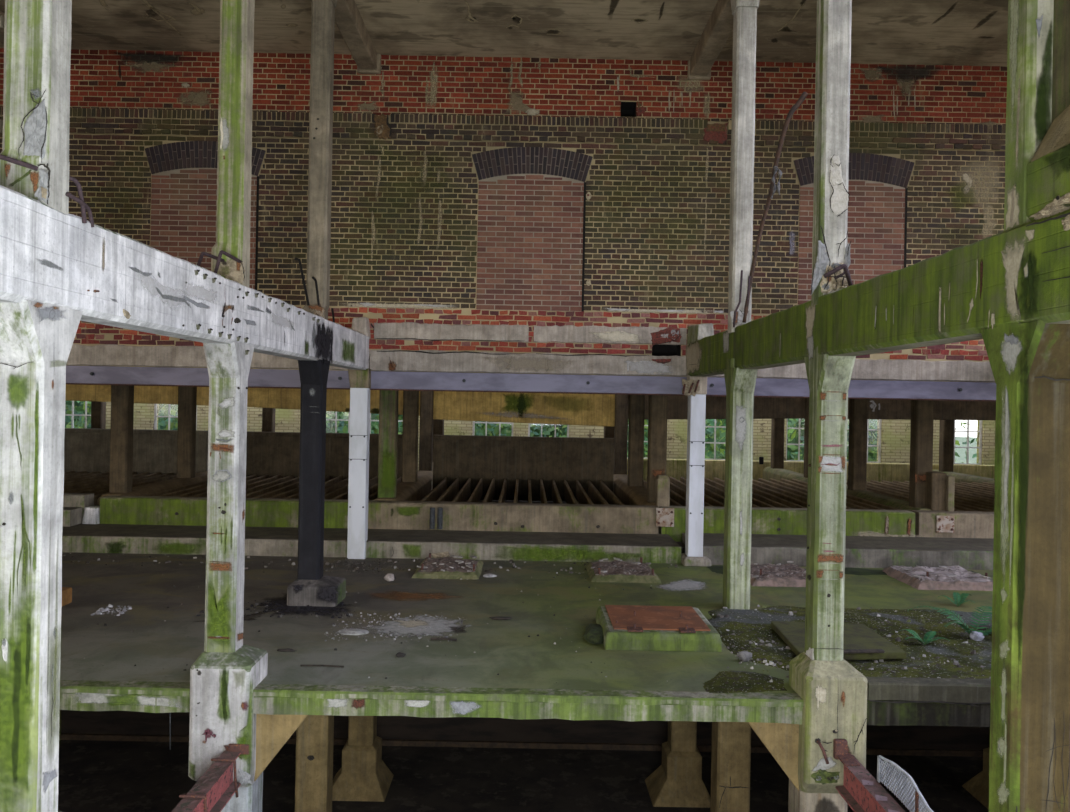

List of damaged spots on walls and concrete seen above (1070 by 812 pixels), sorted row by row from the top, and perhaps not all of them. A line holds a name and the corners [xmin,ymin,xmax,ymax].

corrosion [5,164,39,192]
spalling [0,90,50,203]
spalling [828,155,850,217]
leakage [961,161,998,235]
peeling [1002,186,1070,316]
leakage [313,324,346,360]
peeling [1001,334,1022,374]
leakage [8,385,39,613]
leakage [12,623,31,782]
leakage [43,770,57,792]